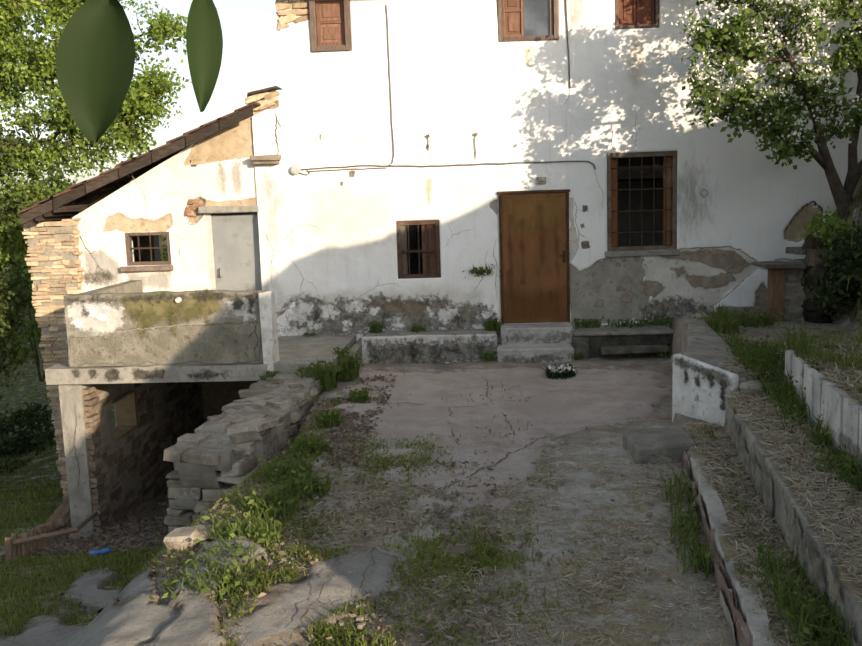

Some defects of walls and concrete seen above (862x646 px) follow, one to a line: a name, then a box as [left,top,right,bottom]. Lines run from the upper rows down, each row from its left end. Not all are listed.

spalling [275,0,310,31]
spalling [184,90,280,167]
spalling [103,213,173,233]
spalling [183,198,256,225]
water stain [80,251,118,285]
crack [263,213,322,293]
spalling [569,198,758,326]
water stain [67,272,258,316]
spalling [754,282,767,306]
water stain [277,293,573,364]